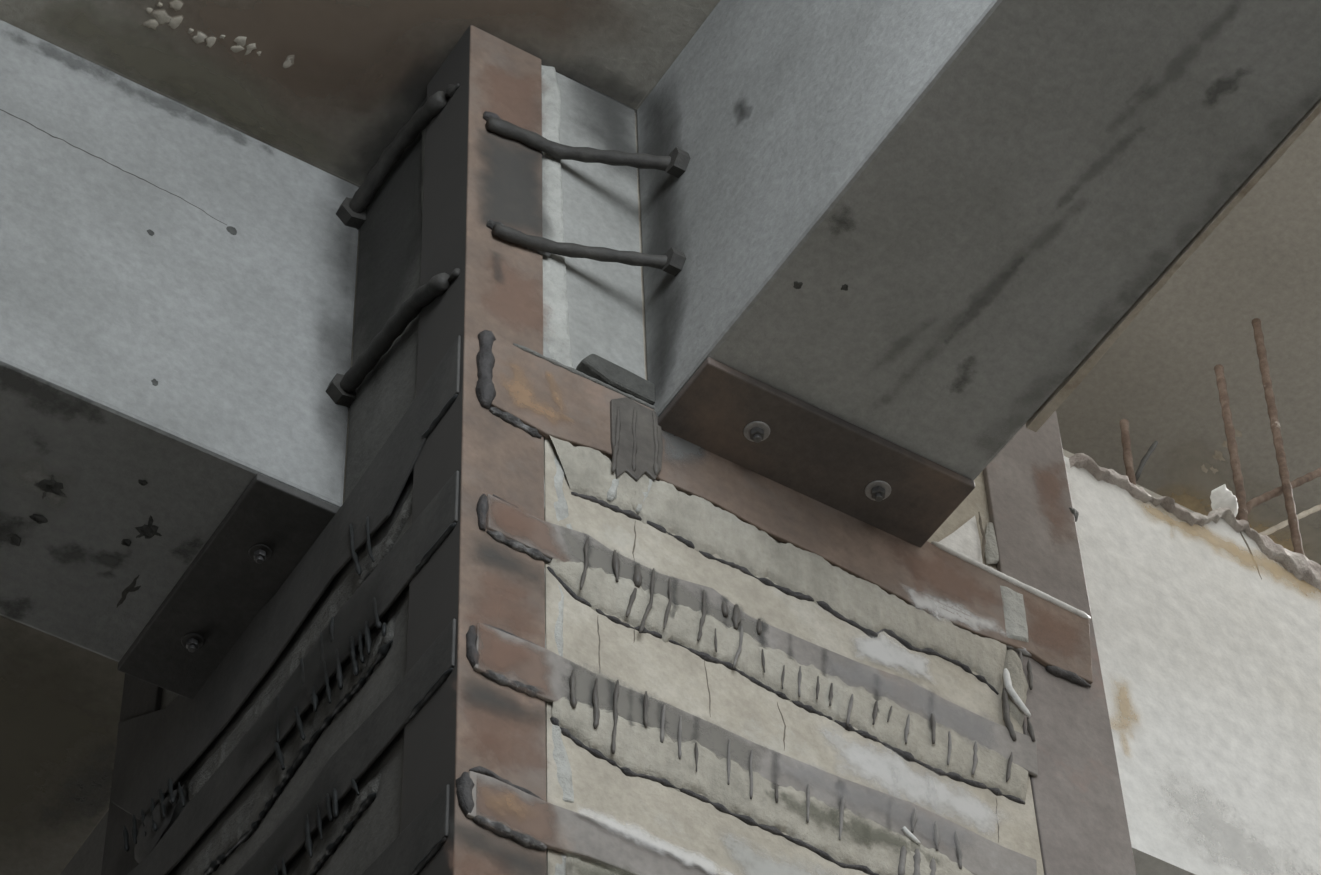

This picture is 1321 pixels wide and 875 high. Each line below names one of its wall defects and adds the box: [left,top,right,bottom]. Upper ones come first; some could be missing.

damp [0,367,100,420]
spalling [1069,318,1321,591]